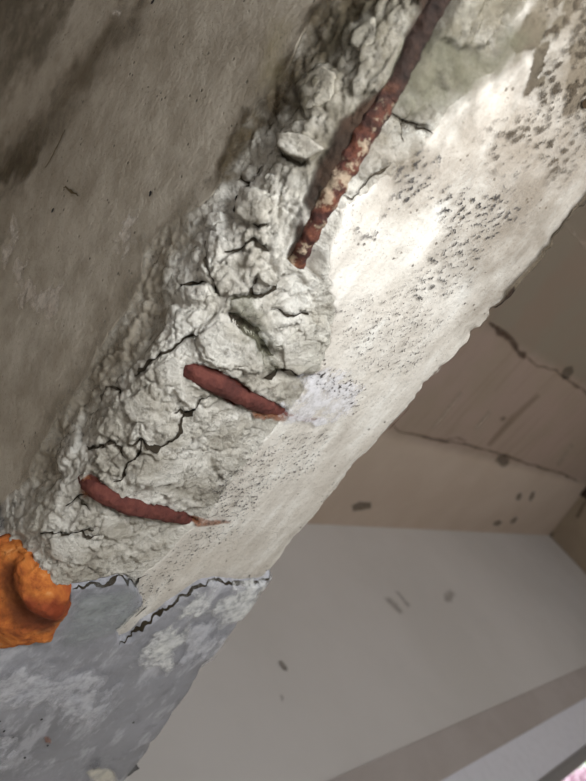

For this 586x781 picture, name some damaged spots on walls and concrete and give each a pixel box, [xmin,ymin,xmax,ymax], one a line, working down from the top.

water stain [216,0,421,187]
water stain [403,0,558,122]
water stain [490,0,586,177]
corrosion [289,91,381,257]
crack [87,396,209,482]
crack [135,334,198,376]
corrosion [193,364,252,392]
crack [180,223,309,380]
spalling [0,0,527,649]
water stain [333,152,521,372]
corrosion [189,516,229,526]
crack [115,577,270,643]